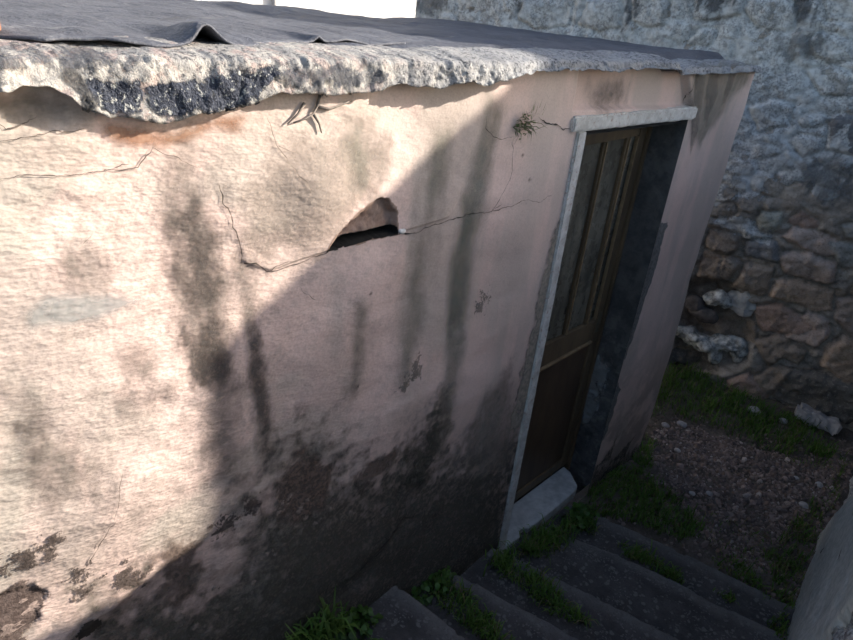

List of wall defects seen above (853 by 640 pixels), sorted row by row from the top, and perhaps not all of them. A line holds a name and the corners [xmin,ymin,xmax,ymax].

crack [0,116,84,141]
crack [4,148,201,179]
crack [268,121,311,189]
crack [398,119,551,235]
crack [219,185,328,272]
hole [326,197,406,253]
water stain [170,199,230,460]
water stain [251,335,267,423]
water stain [93,379,518,640]
peeling [0,531,67,640]
hole [75,618,102,640]
peeling [59,551,155,602]